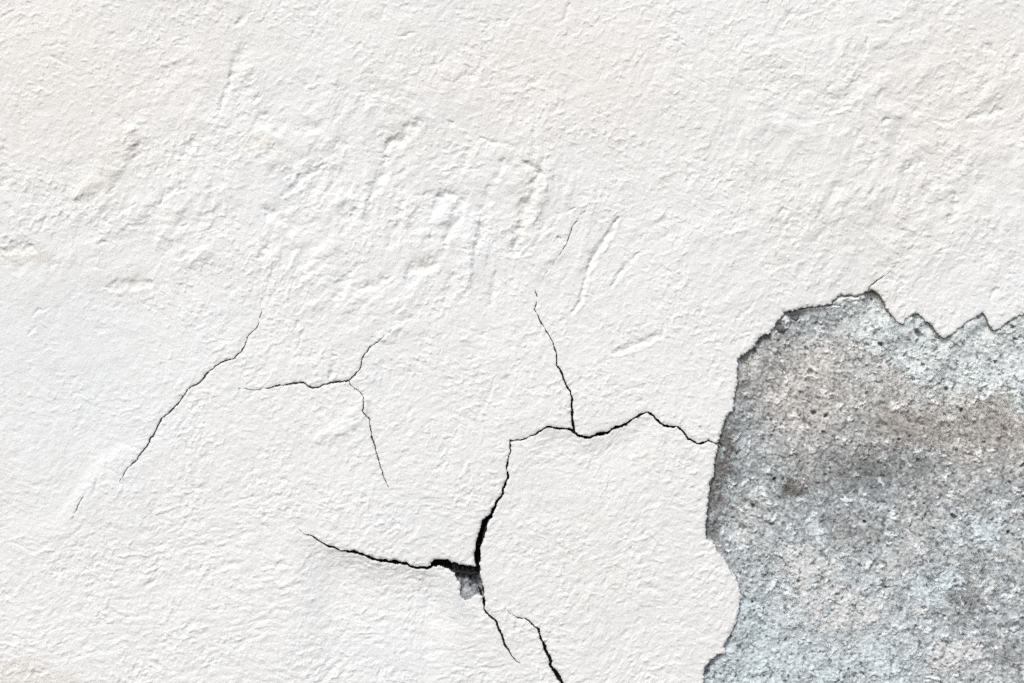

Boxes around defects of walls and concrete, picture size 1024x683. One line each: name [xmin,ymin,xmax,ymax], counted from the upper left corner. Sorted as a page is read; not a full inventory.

crack [119,311,262,482]
crack [238,330,391,487]
crack [300,211,722,683]
flaking render [703,289,1024,683]